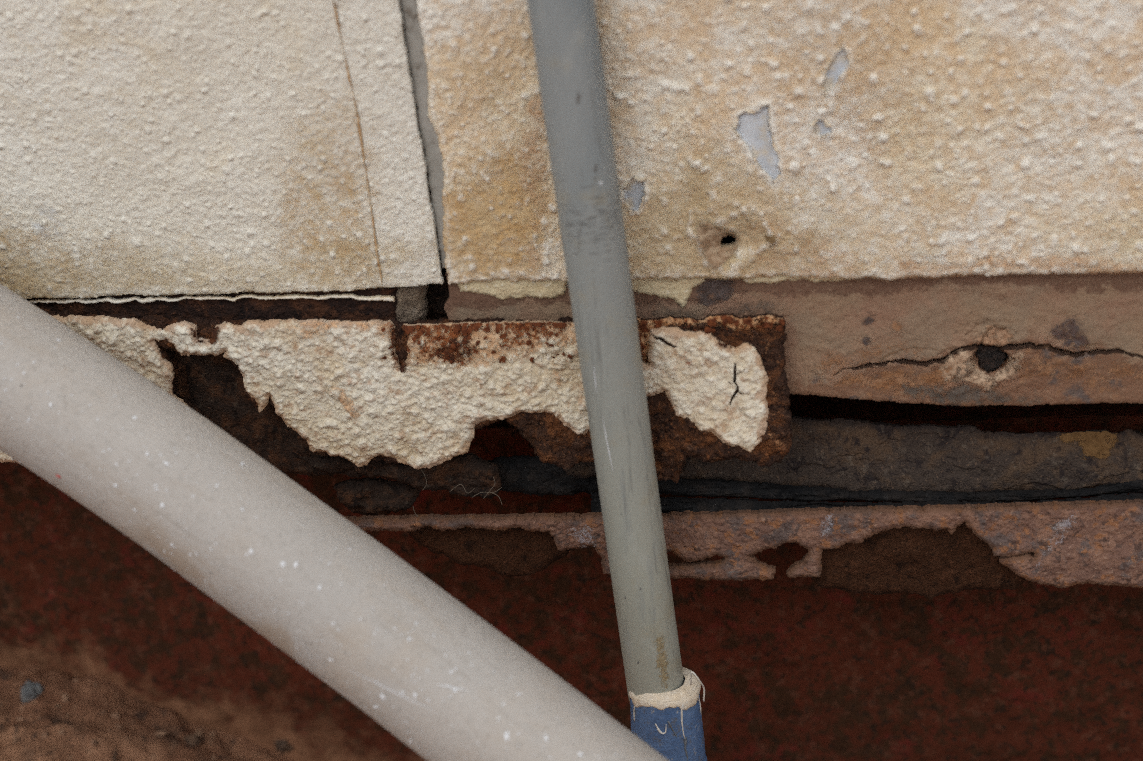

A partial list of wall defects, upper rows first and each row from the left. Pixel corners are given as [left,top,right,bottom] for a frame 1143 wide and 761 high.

peeling [731,105,782,184]
peeling [621,176,646,213]
corrosion [295,321,576,385]
corrosion [636,315,785,360]
crack [834,325,1143,375]
spalling [161,346,363,478]
corrosion [565,461,602,512]
corrosion [657,416,1143,513]